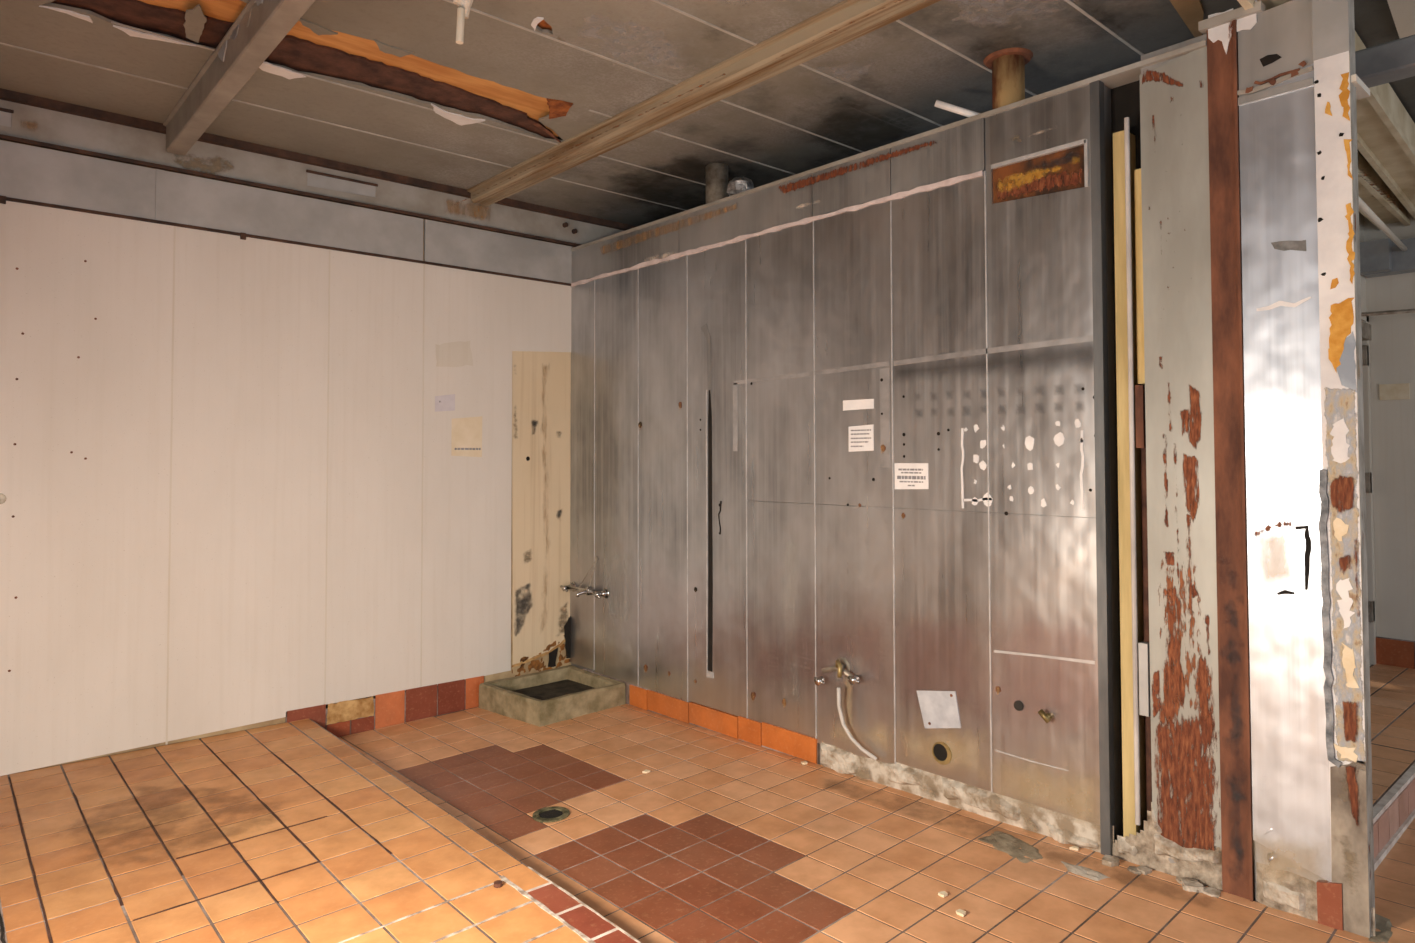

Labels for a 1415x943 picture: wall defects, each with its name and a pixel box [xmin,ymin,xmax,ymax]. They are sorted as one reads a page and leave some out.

peeling [39,5,93,23]
peeling [113,4,207,46]
peeling [259,62,306,80]
corrosion [1142,70,1202,101]
peeling [431,103,485,126]
leakage [827,112,902,152]
peeling [1314,72,1353,179]
corrosion [779,141,936,193]
corrosion [996,159,1082,200]
peeling [1319,203,1370,938]
corrosion [1152,357,1243,851]
spalling [801,742,1222,898]